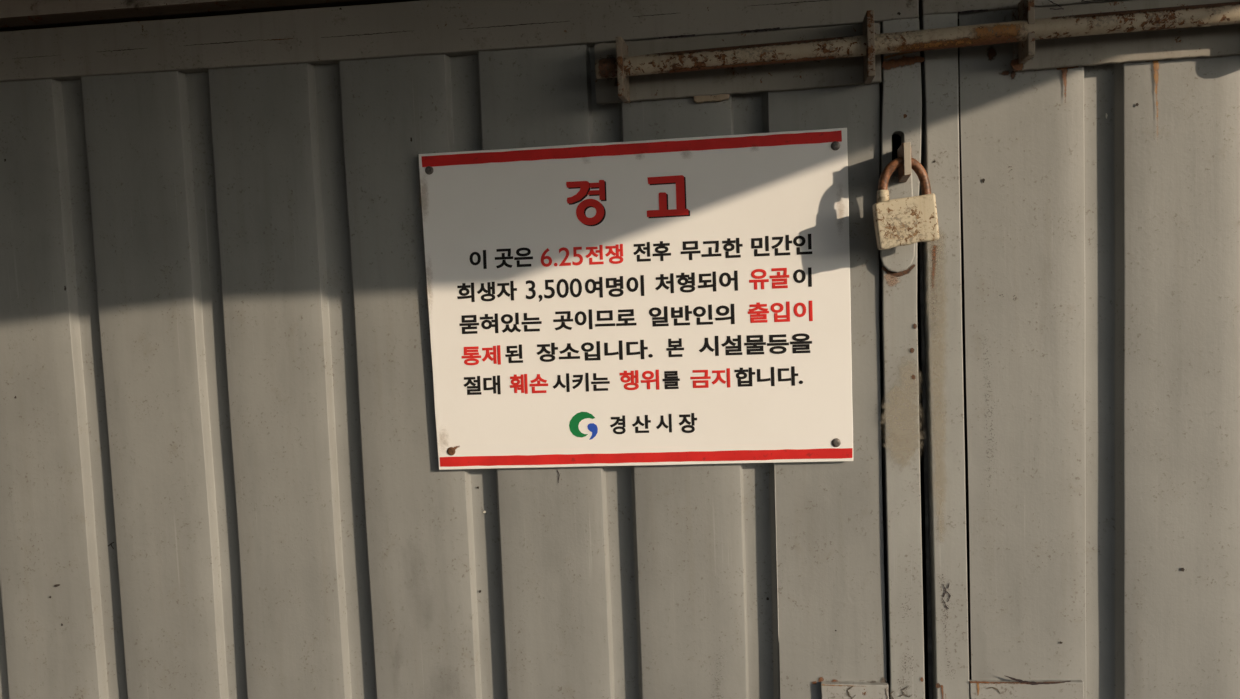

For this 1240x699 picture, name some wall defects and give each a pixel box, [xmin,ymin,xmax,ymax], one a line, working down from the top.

corrosion [1052,1,1240,19]
corrosion [882,24,1024,70]
corrosion [1057,66,1079,97]